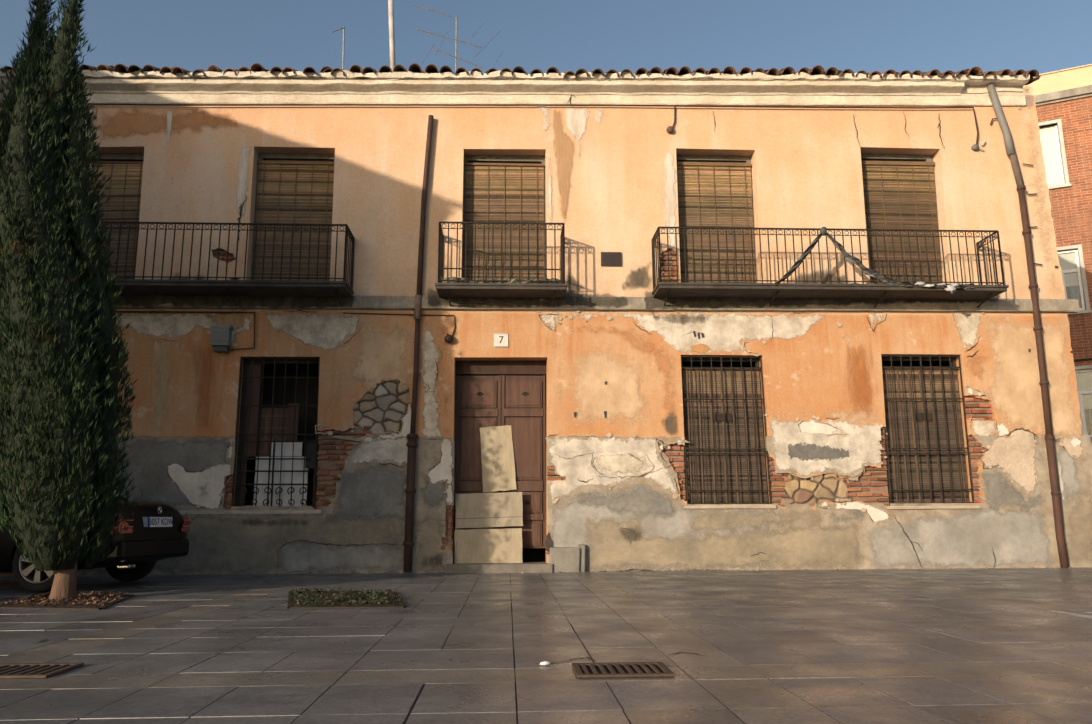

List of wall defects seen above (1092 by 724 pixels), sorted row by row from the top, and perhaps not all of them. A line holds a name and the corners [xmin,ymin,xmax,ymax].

damp [538,106,603,220]
flaking render [113,309,220,341]
flaking render [266,310,362,350]
flaking render [538,310,825,357]
flaking render [167,439,234,510]
flaking render [314,325,454,553]
flaking render [547,433,686,504]
flaking render [765,414,890,524]
flaking render [964,385,1038,503]